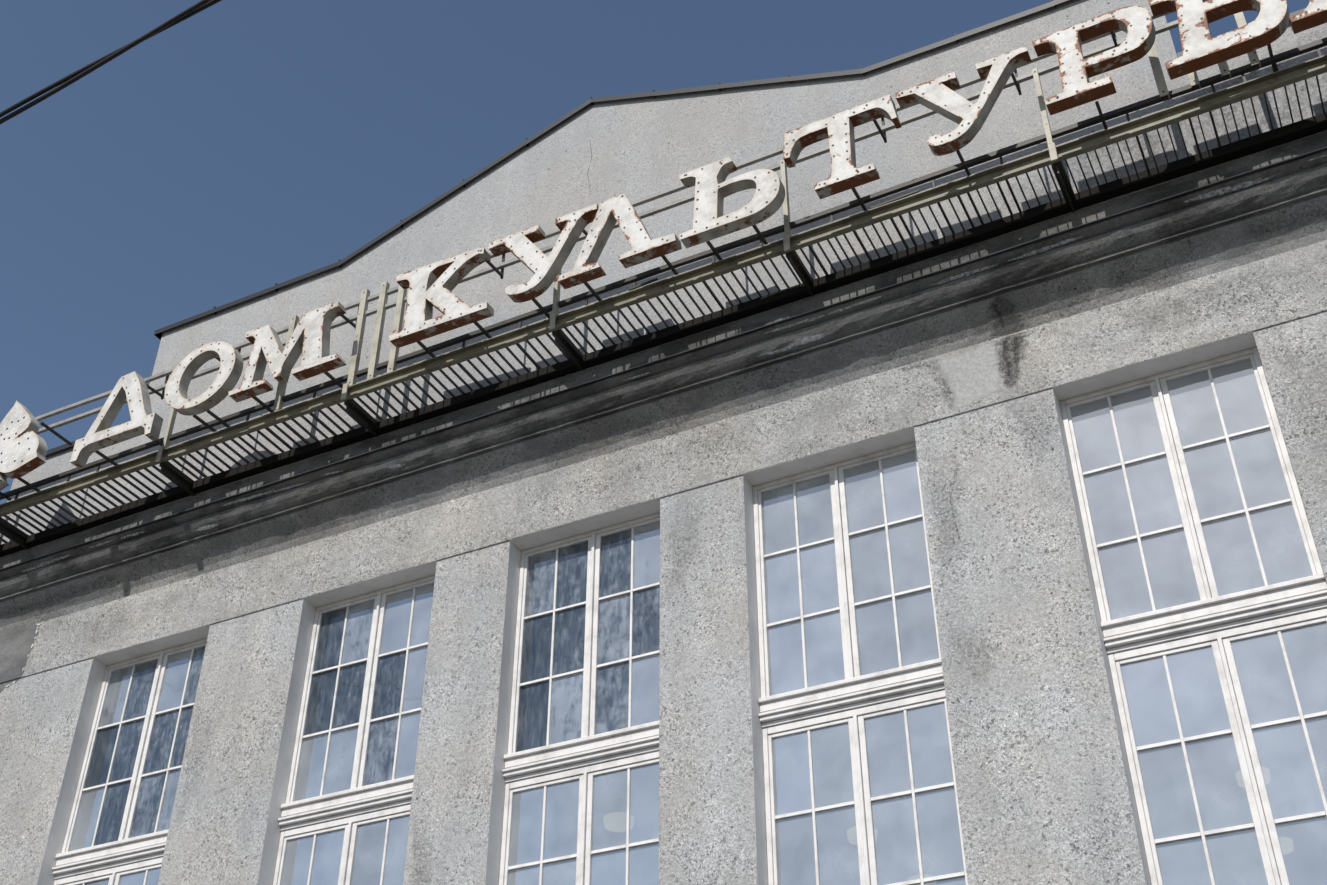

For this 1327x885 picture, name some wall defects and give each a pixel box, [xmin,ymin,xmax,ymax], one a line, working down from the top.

leakage [989,296,1025,385]